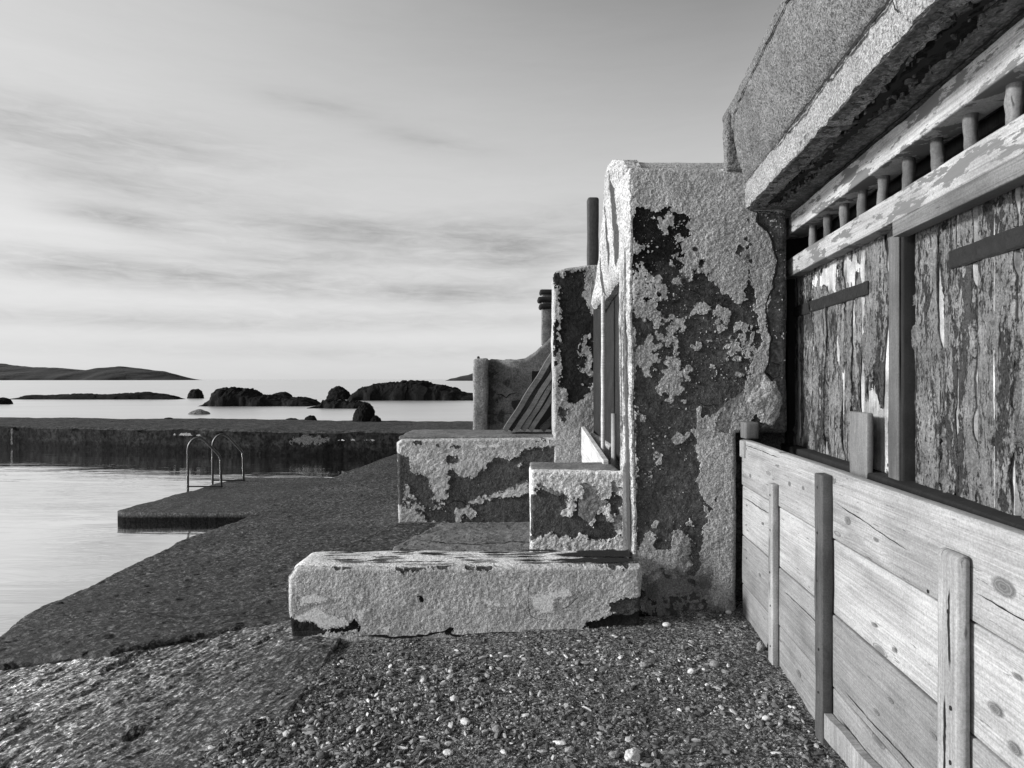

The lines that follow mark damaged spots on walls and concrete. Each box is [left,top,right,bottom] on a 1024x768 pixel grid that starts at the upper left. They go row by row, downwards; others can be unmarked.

flaking render [553,269,593,423]
flaking render [583,0,998,628]
flaking render [397,438,622,542]
spalling [396,565,452,575]